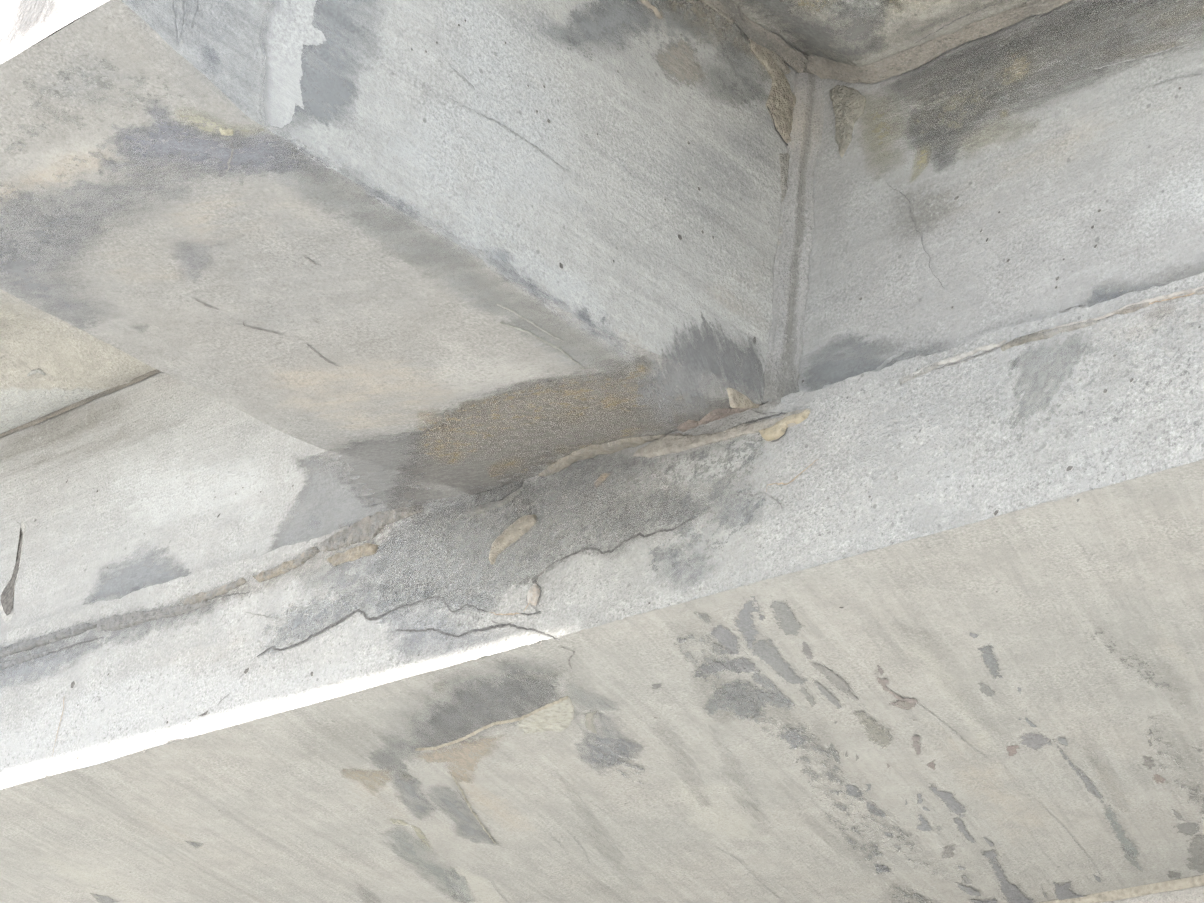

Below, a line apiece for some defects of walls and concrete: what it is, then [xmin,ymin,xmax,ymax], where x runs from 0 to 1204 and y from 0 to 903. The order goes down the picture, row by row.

peeling [263,0,327,128]
water stain [295,0,360,126]
water stain [567,0,763,101]
peeling [747,36,796,145]
water stain [904,0,1204,150]
water stain [273,315,763,651]
peeling [633,404,811,492]
crack [0,519,25,623]
crack [164,459,818,745]
water stain [374,664,553,900]